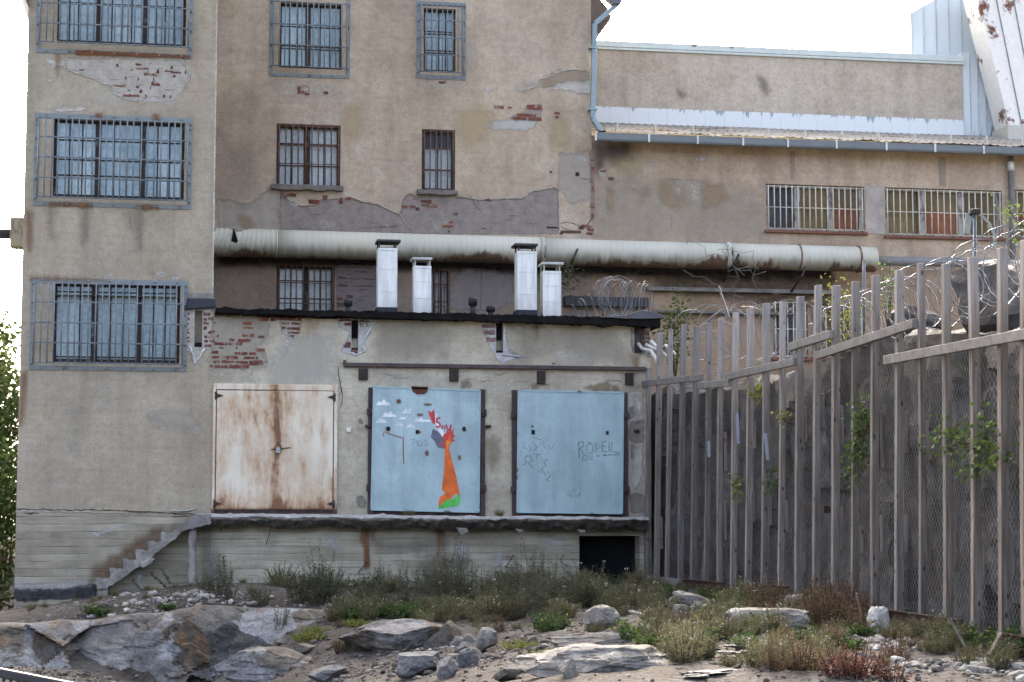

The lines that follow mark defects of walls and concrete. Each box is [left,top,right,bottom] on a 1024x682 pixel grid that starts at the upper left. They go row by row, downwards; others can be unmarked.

flaking render [46,57,191,102]
flaking render [212,3,614,293]
flaking render [187,308,302,370]
flaking render [332,264,377,356]
flaking render [474,324,530,394]
corrosion [361,529,370,568]